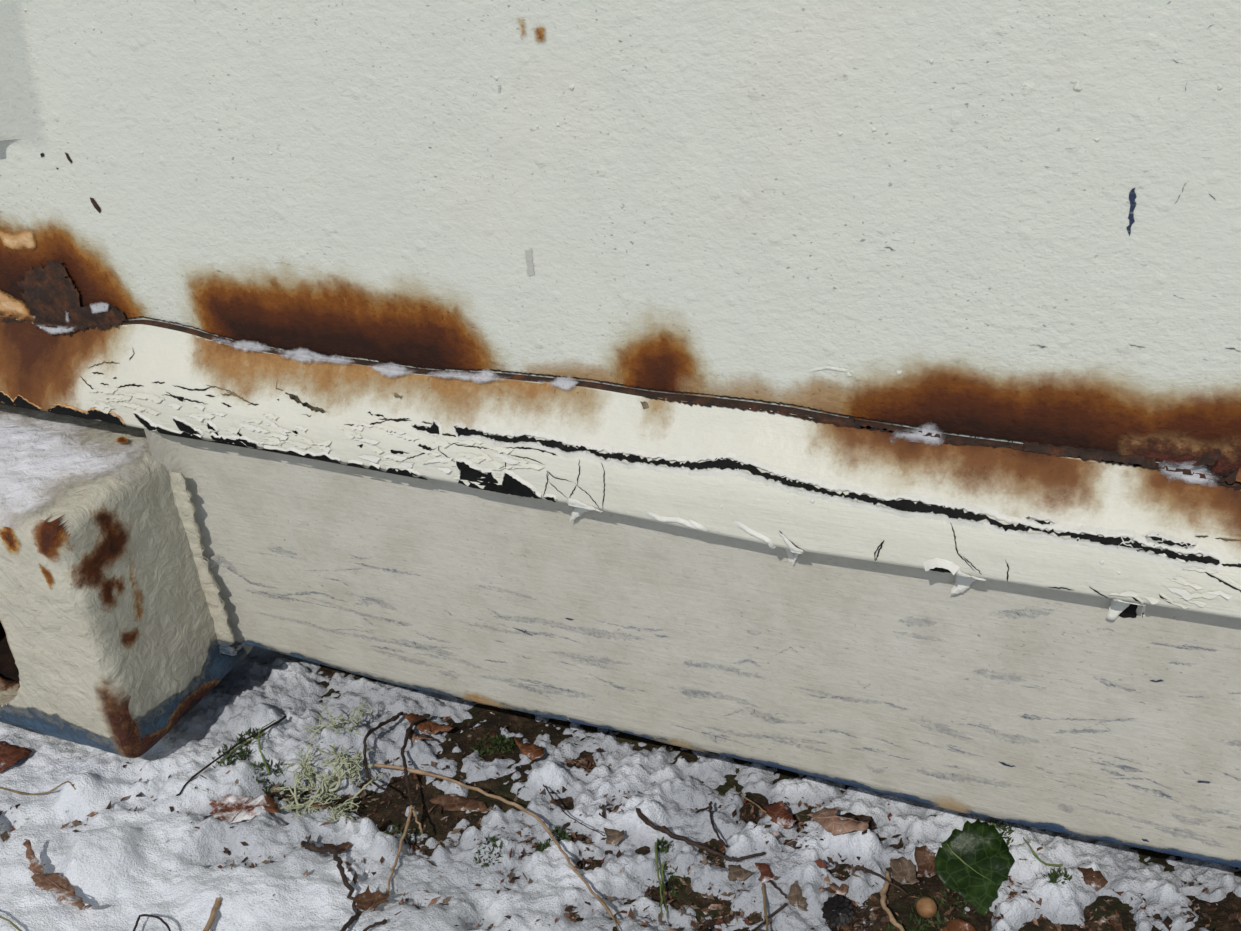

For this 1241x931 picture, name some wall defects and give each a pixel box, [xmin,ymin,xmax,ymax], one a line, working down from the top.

corrosion [0,514,71,588]
corrosion [0,226,143,412]
corrosion [73,509,143,648]
crack [80,351,284,407]
peeling [0,387,603,522]
corrosion [190,277,1241,537]
crack [344,418,1241,618]
peeling [1106,545,1234,620]